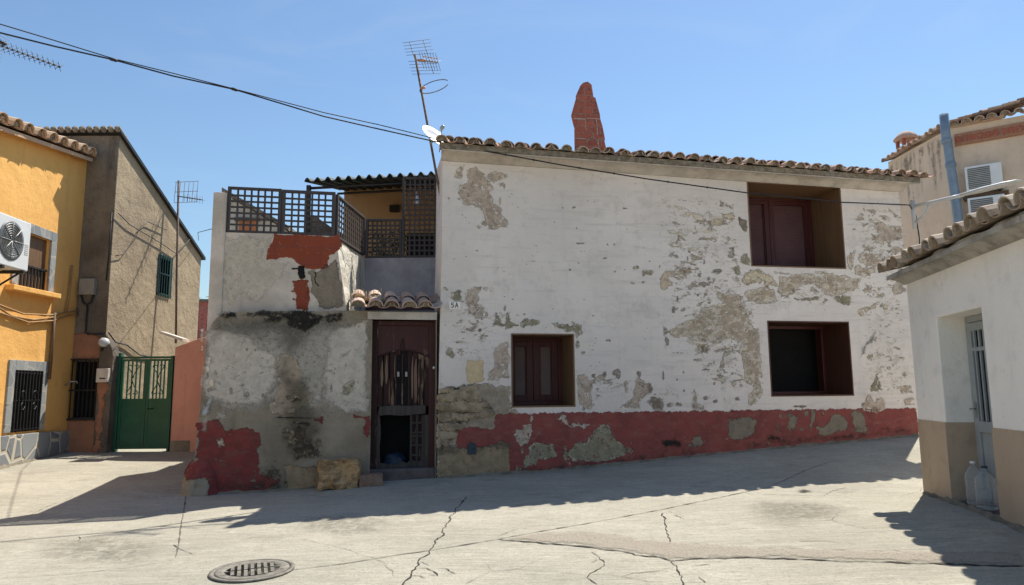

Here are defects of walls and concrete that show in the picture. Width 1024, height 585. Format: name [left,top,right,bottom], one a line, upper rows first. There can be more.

peeling [195,320,371,492]
flaking render [267,234,344,310]
peeling [448,165,509,230]
flaking render [436,286,633,471]
peeling [577,198,914,440]
crack [307,497,705,585]